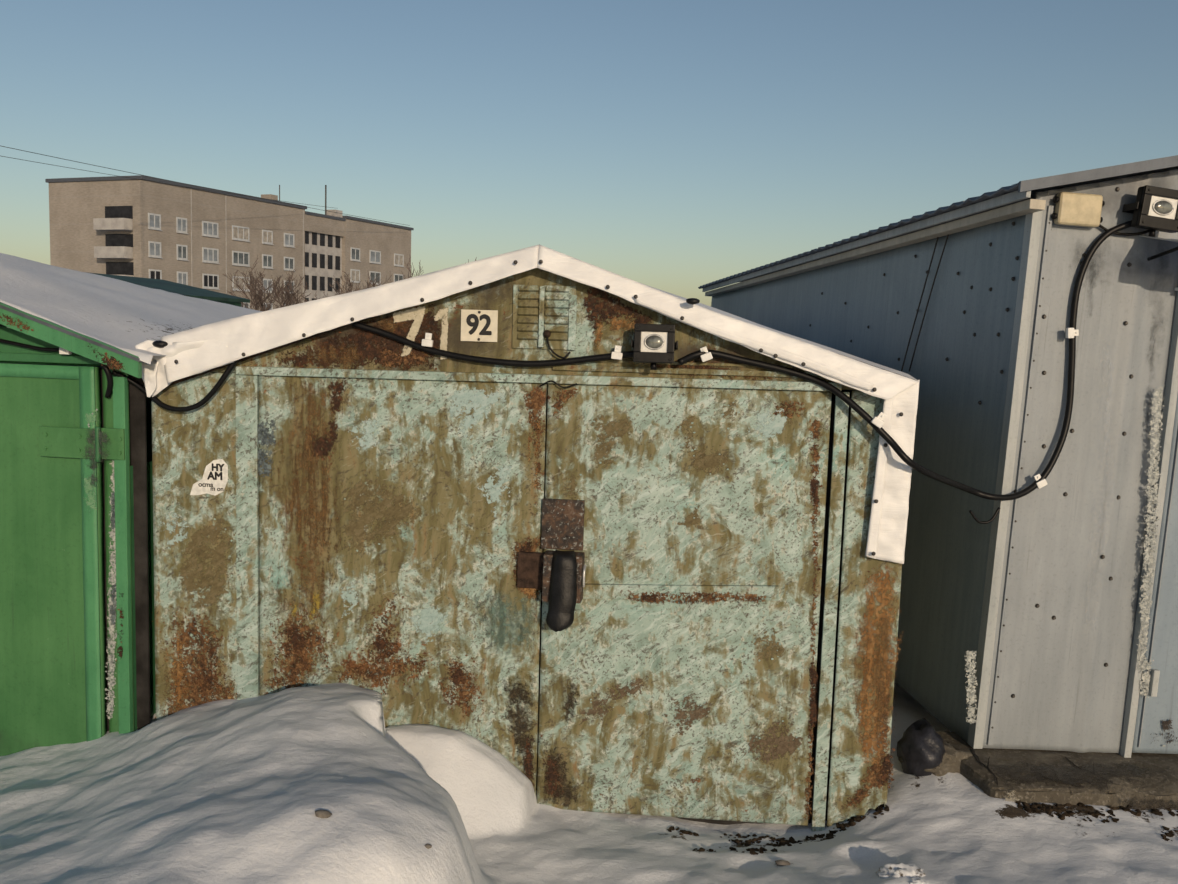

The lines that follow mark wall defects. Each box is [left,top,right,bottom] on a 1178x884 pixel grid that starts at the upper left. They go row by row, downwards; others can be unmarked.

corrosion [582,287,652,348]
peeling [447,385,507,440]
peeling [720,402,787,440]
corrosion [259,304,493,723]
peeling [477,464,512,517]
corrosion [628,591,766,605]
corrosion [773,400,823,819]
corrosion [155,599,237,718]
peeling [576,673,655,723]
peeling [664,694,717,736]
corrosion [841,563,900,810]
peeling [736,719,808,767]